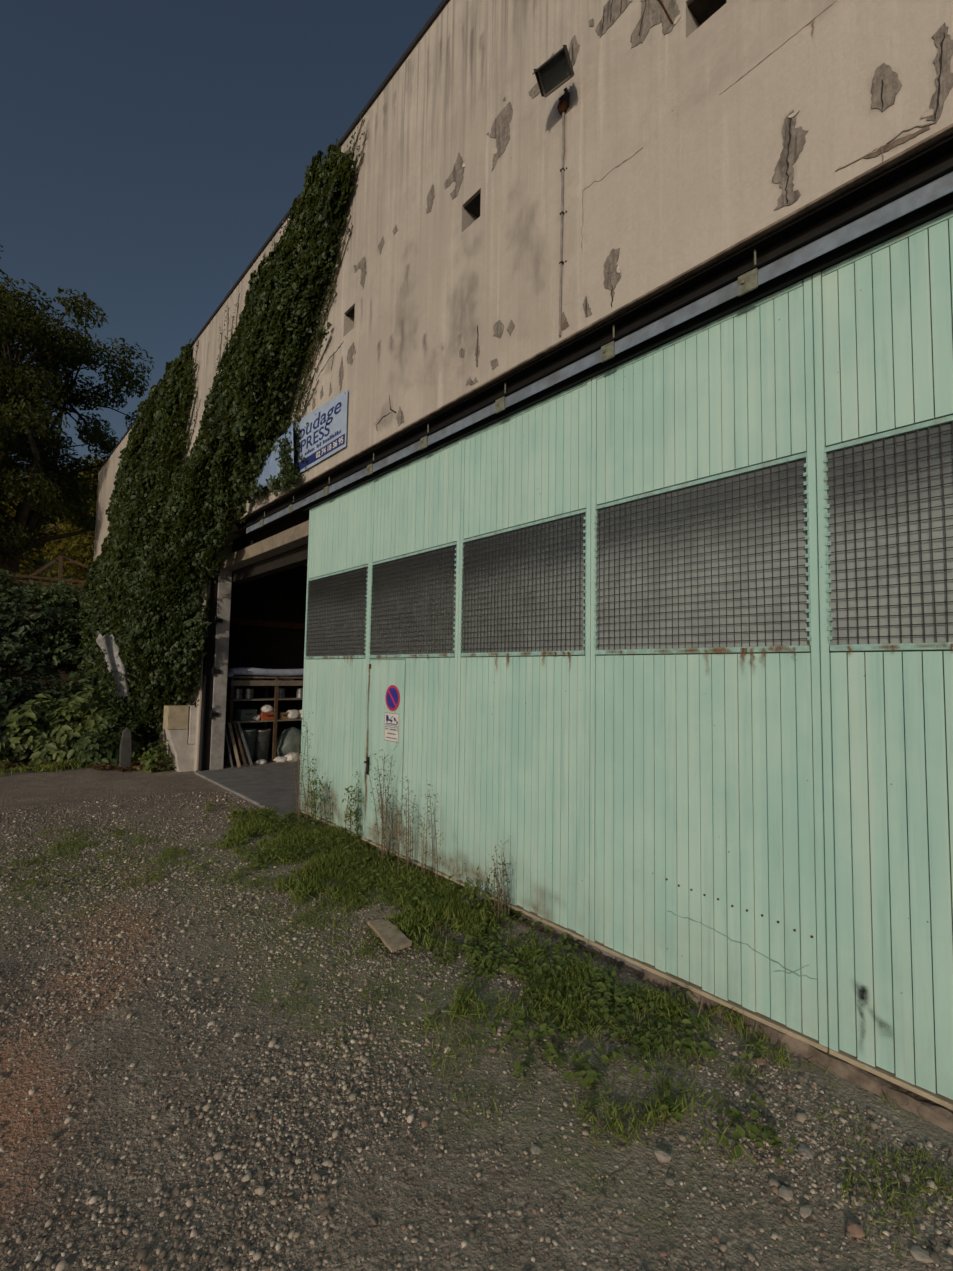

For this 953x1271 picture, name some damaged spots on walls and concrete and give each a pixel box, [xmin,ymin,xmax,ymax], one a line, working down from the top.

peeling [551,35,580,67]
peeling [588,0,681,48]
crack [719,0,836,95]
peeling [835,23,953,172]
peeling [425,152,465,214]
peeling [486,97,513,171]
peeling [772,109,808,210]
peeling [603,248,621,307]
corrosion [685,646,795,660]